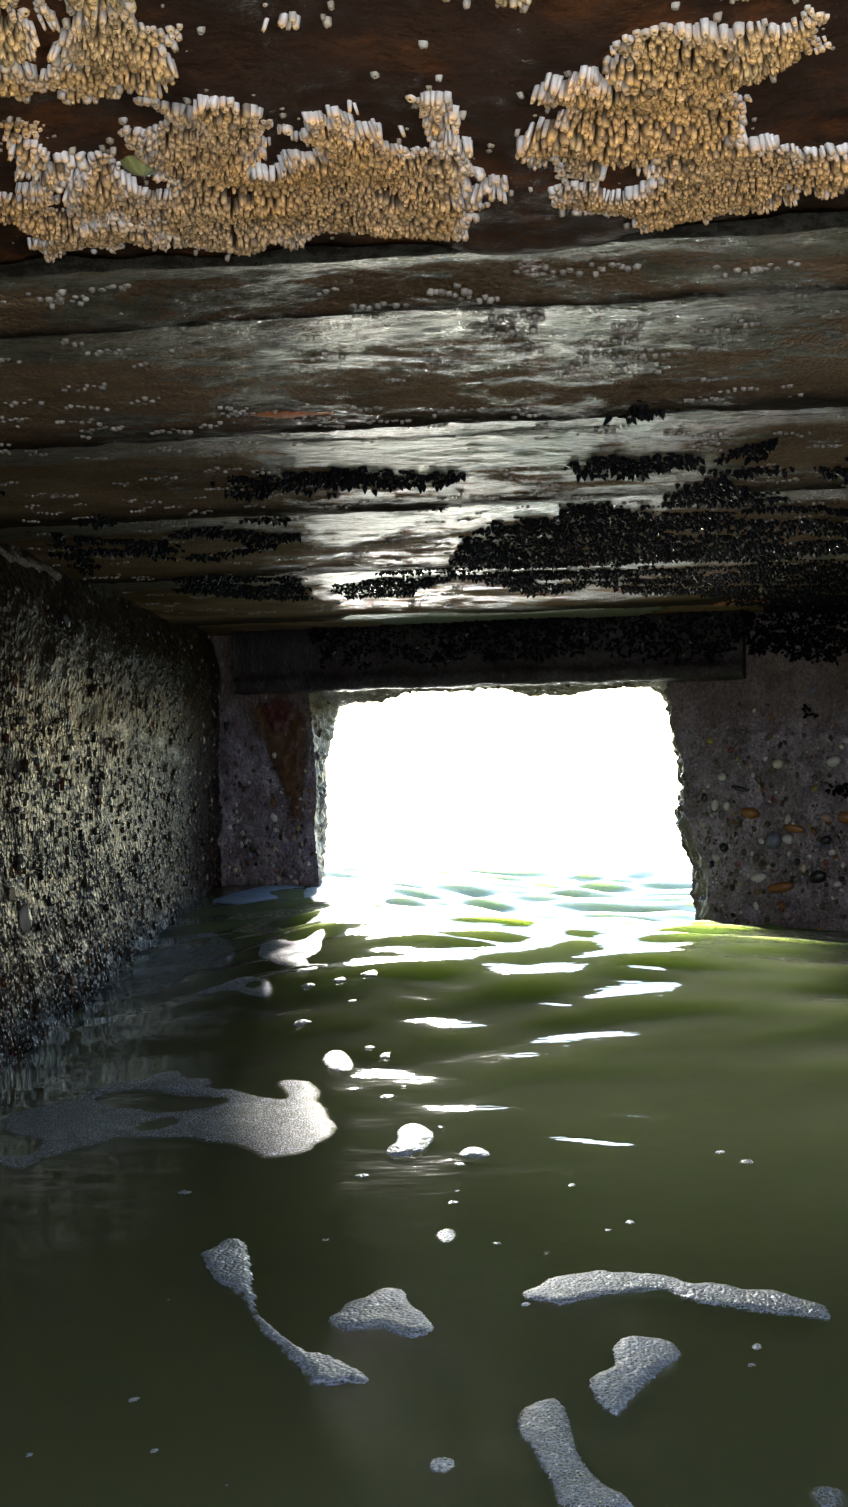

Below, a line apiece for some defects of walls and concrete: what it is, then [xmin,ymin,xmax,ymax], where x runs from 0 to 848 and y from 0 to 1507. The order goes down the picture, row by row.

corrosion [254,699,306,827]